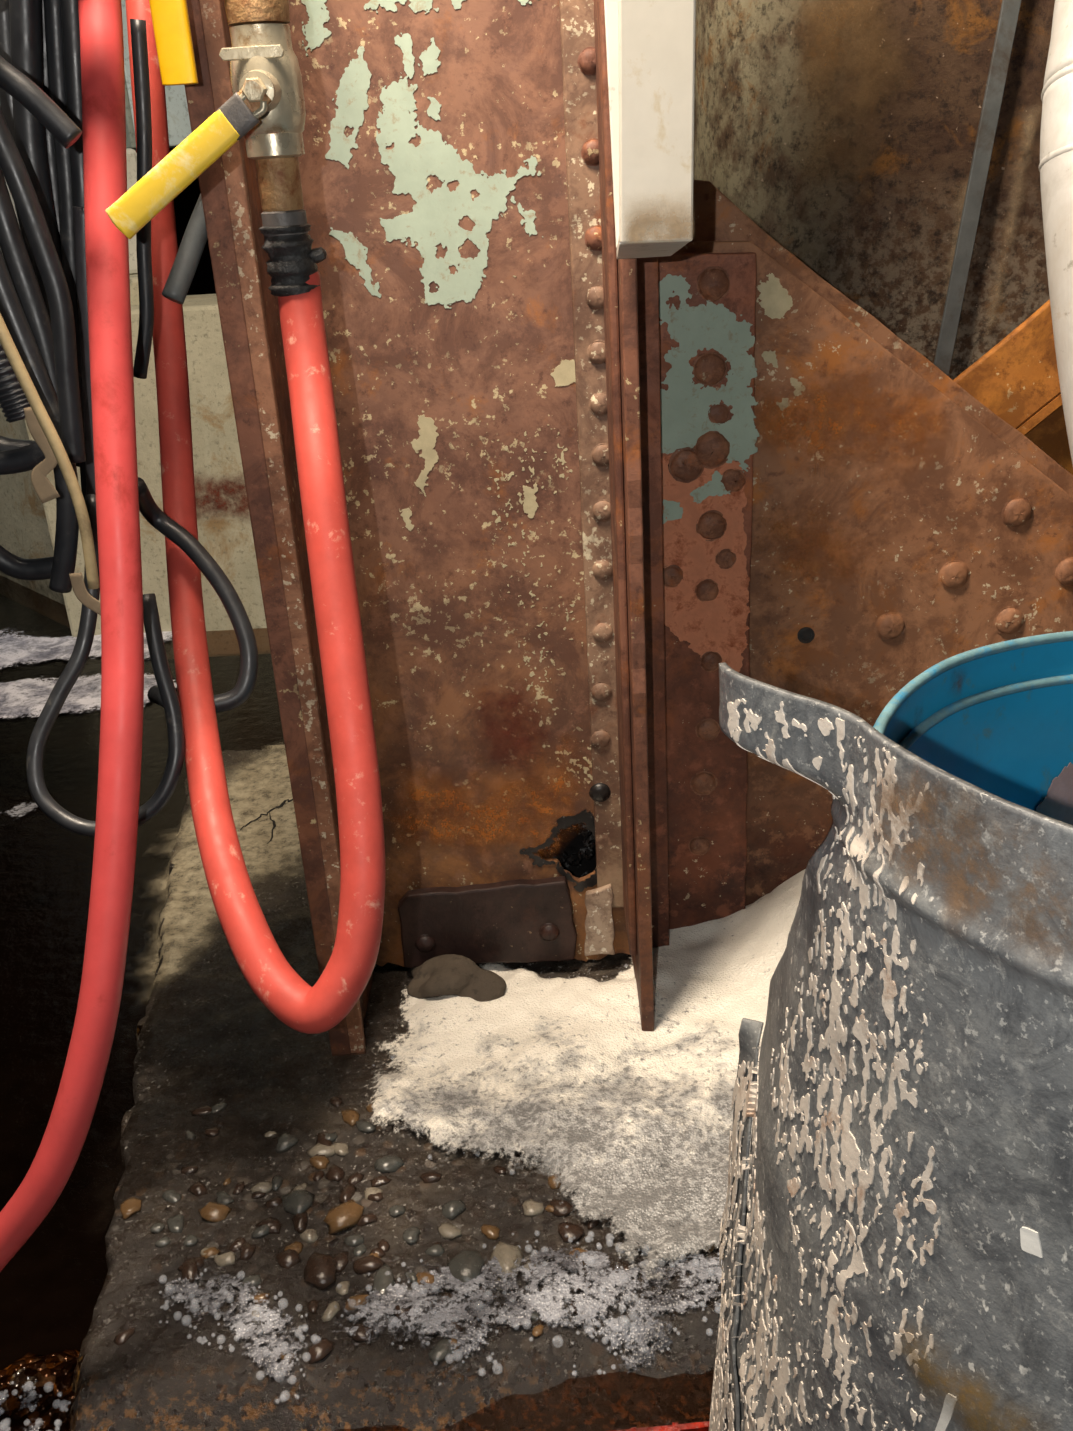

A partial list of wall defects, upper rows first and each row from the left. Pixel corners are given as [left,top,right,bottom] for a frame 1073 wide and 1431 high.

peeling [301,0,331,56]
peeling [364,0,464,14]
peeling [325,33,543,309]
rust [627,211,691,242]
peeling [483,424,593,787]
peeling [659,273,806,672]